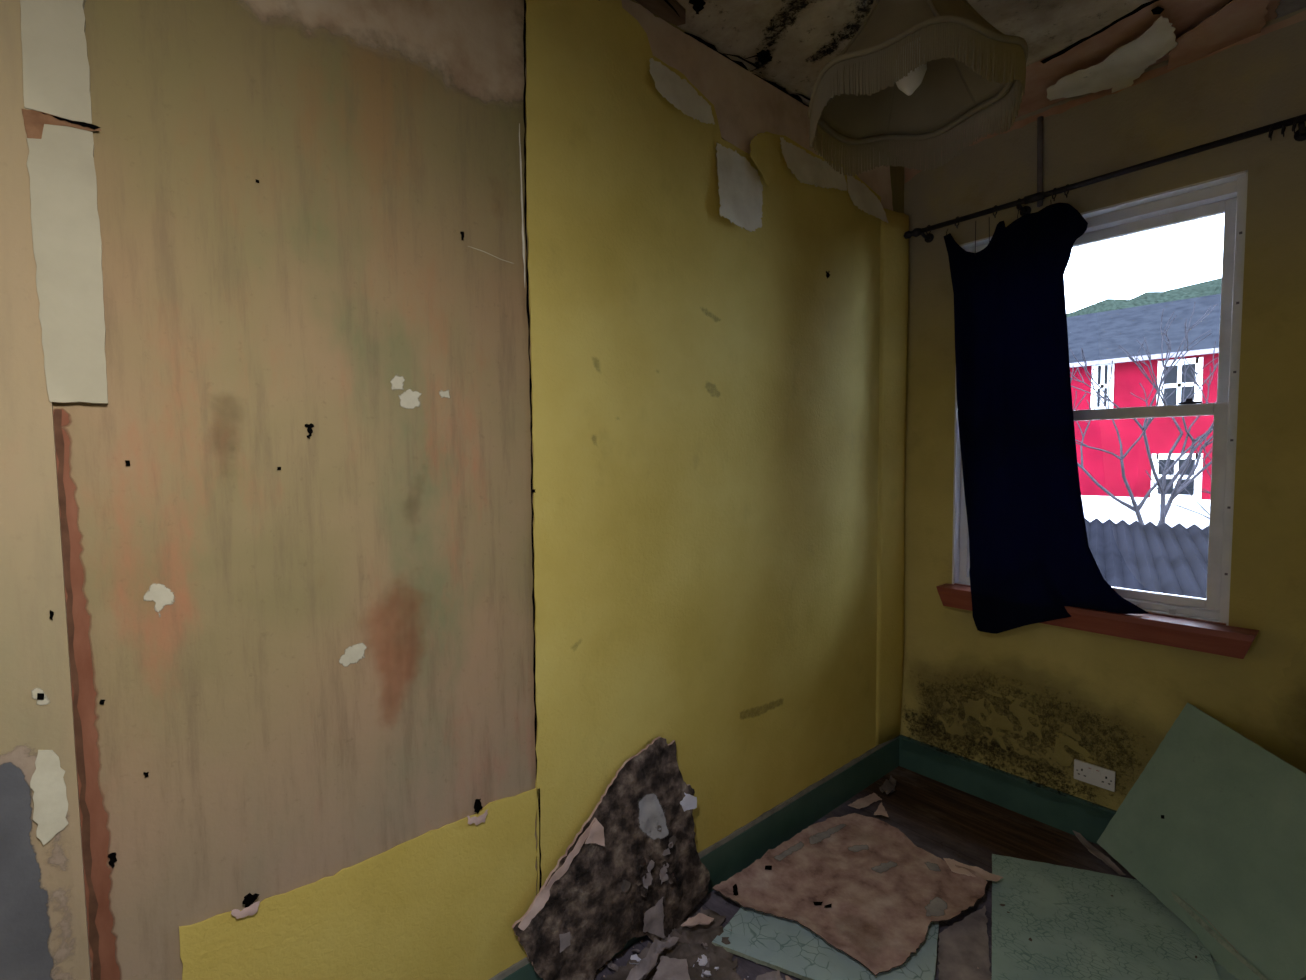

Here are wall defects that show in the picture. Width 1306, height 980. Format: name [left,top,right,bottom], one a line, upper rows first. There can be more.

flaking render [241,0,527,103]
mould [755,0,822,74]
mould [807,0,874,62]
peeling [621,0,893,232]
peeling [390,375,421,409]
mould [904,678,1139,800]
peeling [467,810,488,825]
peeling [231,901,260,919]